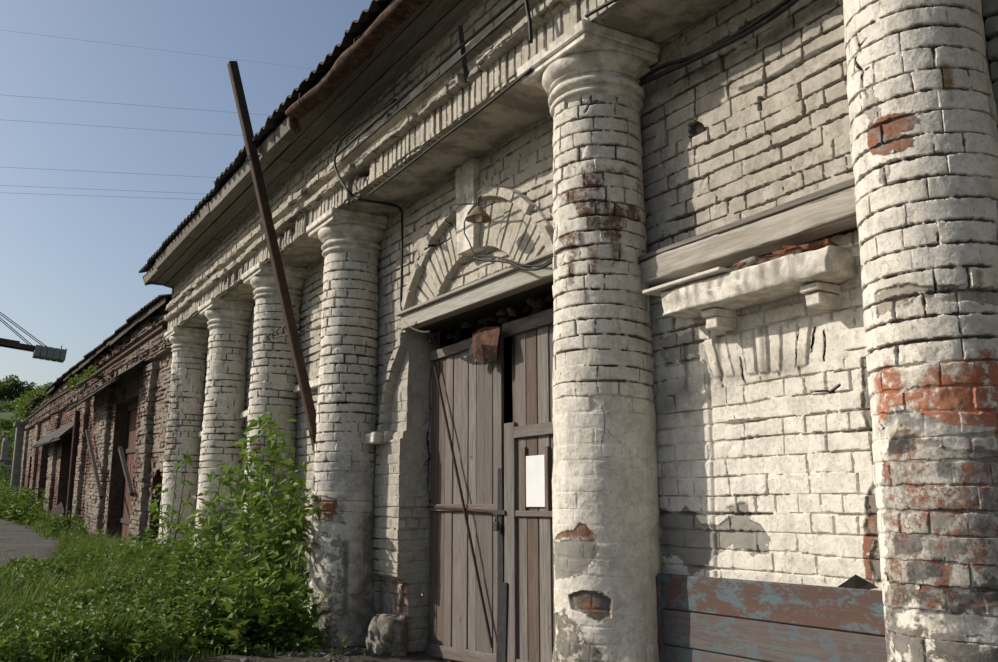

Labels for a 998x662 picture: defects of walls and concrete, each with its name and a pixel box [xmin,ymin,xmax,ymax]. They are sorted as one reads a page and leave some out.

flaking render [863,84,920,185]
crack [795,326,826,361]
crack [811,385,841,397]
spalling [838,349,998,616]
peeling [310,496,347,647]
peeling [554,522,599,579]
peeling [659,501,770,576]
peeling [552,590,612,662]
peeling [885,628,998,662]